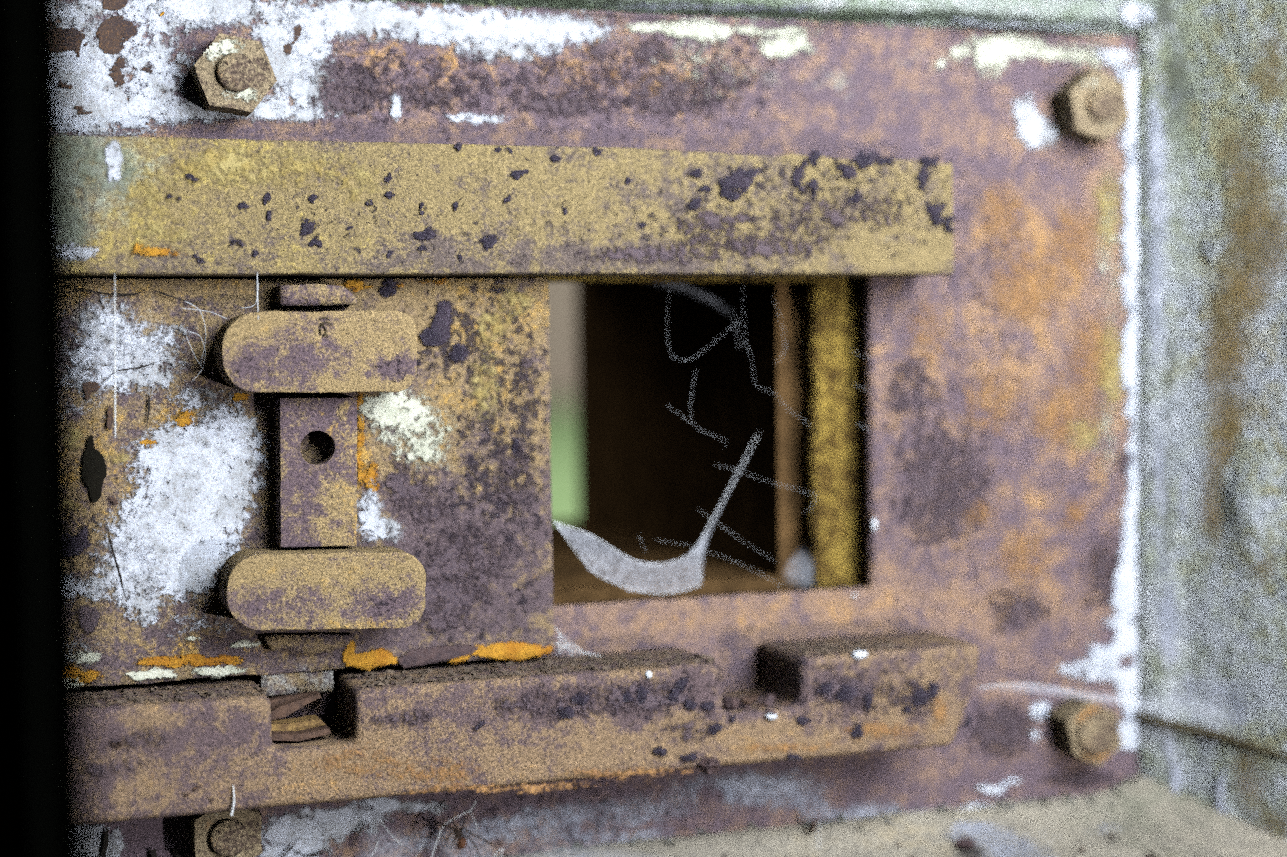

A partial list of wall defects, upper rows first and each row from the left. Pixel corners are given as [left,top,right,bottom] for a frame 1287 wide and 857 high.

rust [74,0,153,87]
rust [284,24,302,55]
peeling [73,0,825,260]
leakage [933,18,1284,752]
rust [84,435,157,510]
peeling [82,286,274,683]
rust [342,640,398,672]
rust [449,641,554,664]
rust [267,674,950,795]
leakage [1165,730,1184,794]
leakage [1216,770,1230,817]
peeling [95,824,128,857]